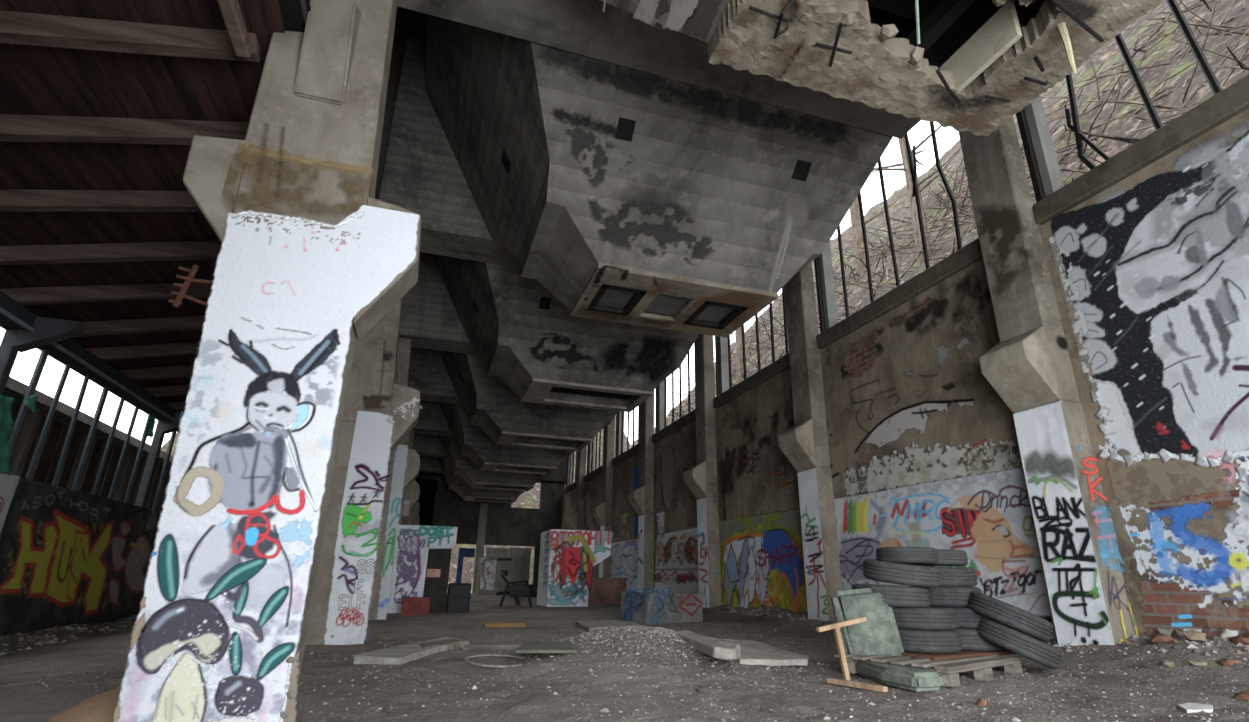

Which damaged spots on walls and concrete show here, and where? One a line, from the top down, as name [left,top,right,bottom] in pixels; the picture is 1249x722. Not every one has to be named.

damp [545,48,845,143]
spalling [737,0,857,87]
spalling [880,24,899,40]
spalling [909,46,924,66]
spalling [930,47,1051,127]
spalling [1050,0,1104,42]
damp [554,109,617,186]
damp [589,200,712,261]
damp [531,334,598,371]
peeling [842,380,1023,496]
peeling [1050,242,1249,640]